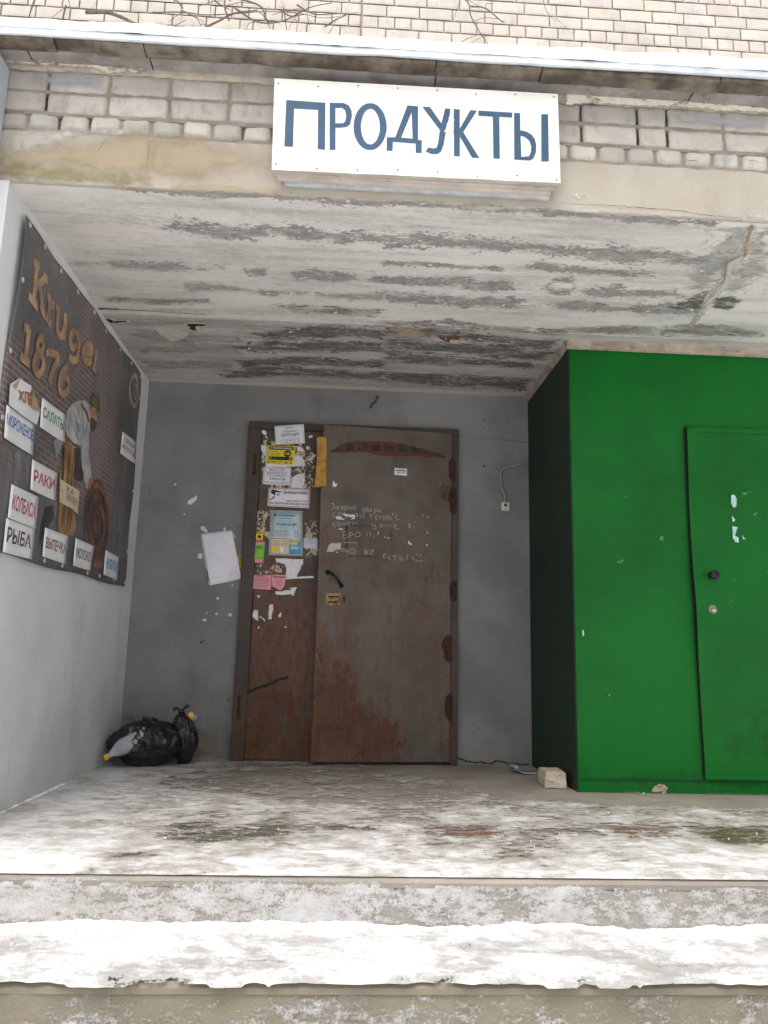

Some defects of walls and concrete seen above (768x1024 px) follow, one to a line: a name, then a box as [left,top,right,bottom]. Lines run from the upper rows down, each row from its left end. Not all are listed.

peeling [103,187,730,317]
crack [571,203,768,335]
peeling [153,322,208,349]
peeling [150,377,517,396]